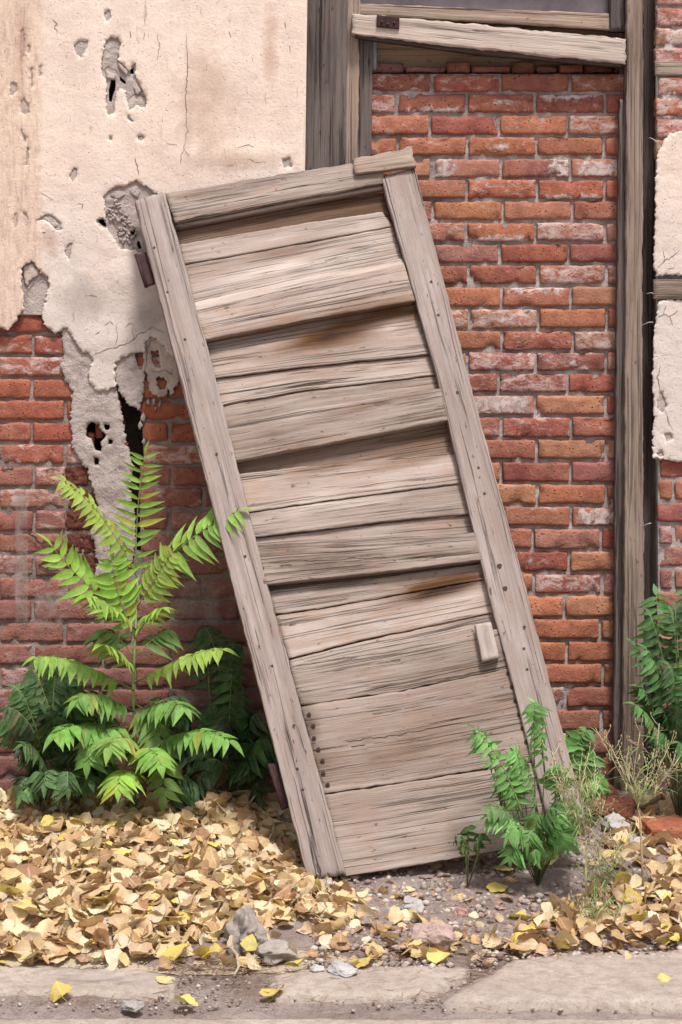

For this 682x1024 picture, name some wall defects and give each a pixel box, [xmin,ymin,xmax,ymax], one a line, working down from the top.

flaking render [101,37,147,122]
crack [166,35,189,164]
flaking render [97,180,158,253]
flaking render [20,261,50,315]
peeling [60,328,180,584]